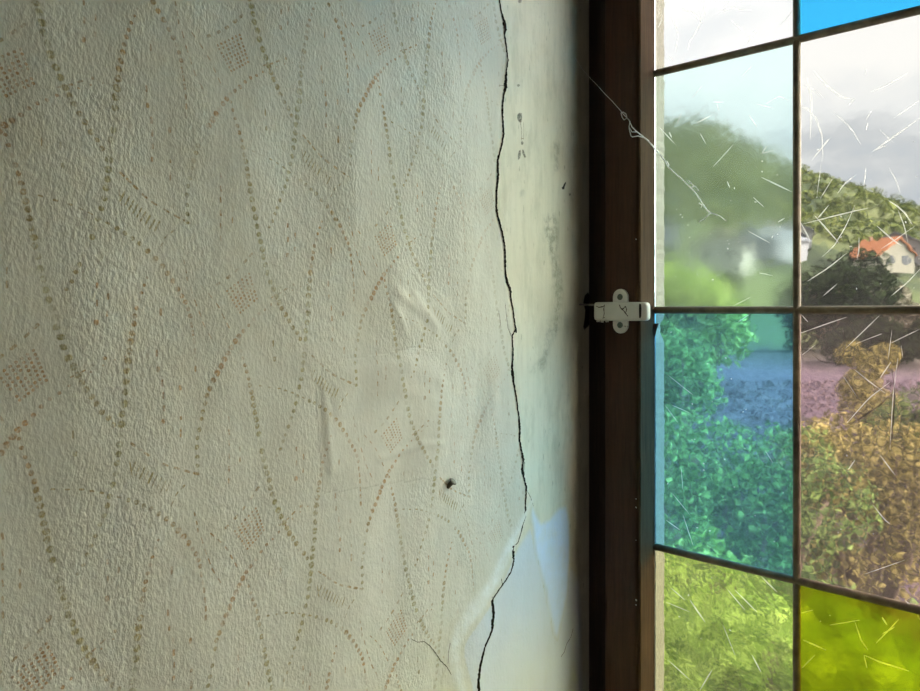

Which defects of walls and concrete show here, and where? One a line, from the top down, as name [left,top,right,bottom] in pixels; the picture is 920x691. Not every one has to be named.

crack [477,0,532,691]